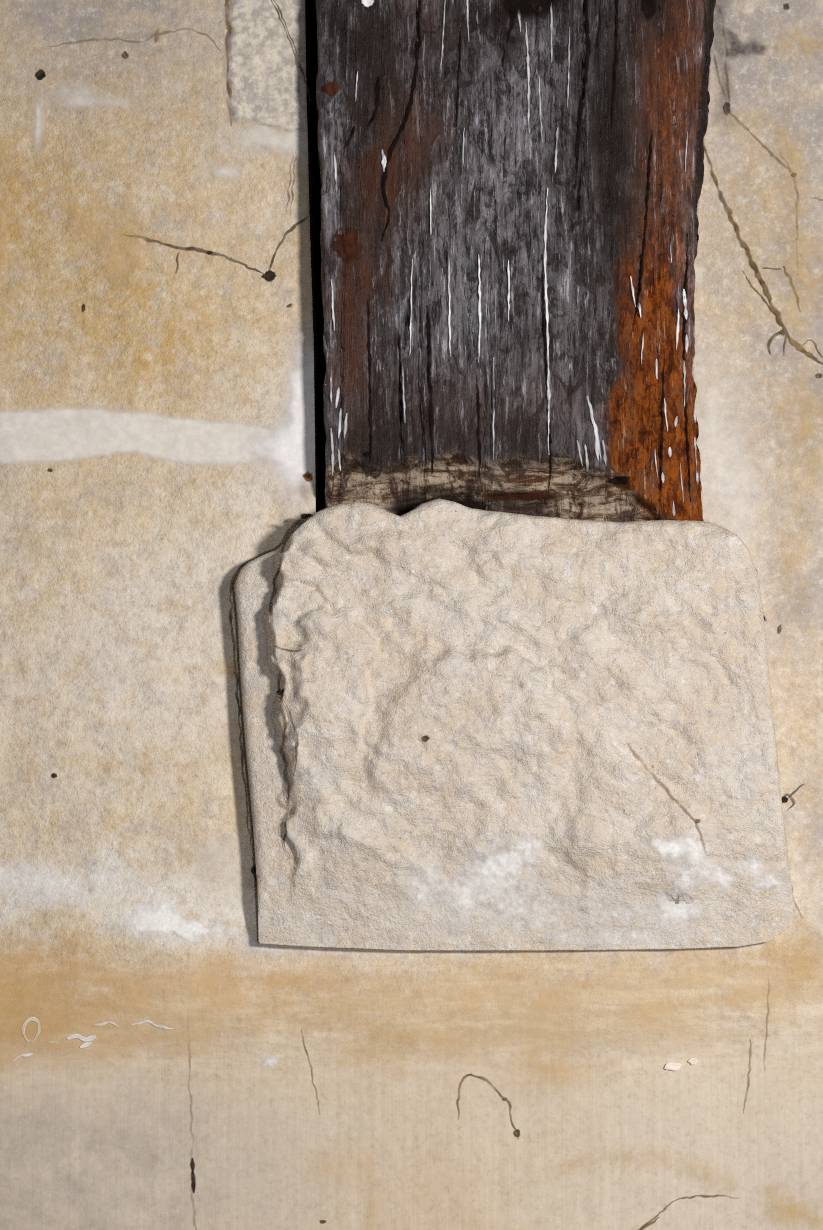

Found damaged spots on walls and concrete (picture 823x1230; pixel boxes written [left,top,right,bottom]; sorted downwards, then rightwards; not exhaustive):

crack [273,0,310,97]
crack [715,27,737,119]
crack [124,159,310,281]
crack [703,141,823,378]
crack [229,512,315,885]
water stain [250,941,380,958]
water stain [12,1017,40,1061]
water stain [52,1020,173,1048]
crack [457,1074,520,1139]
crack [639,1195,733,1230]